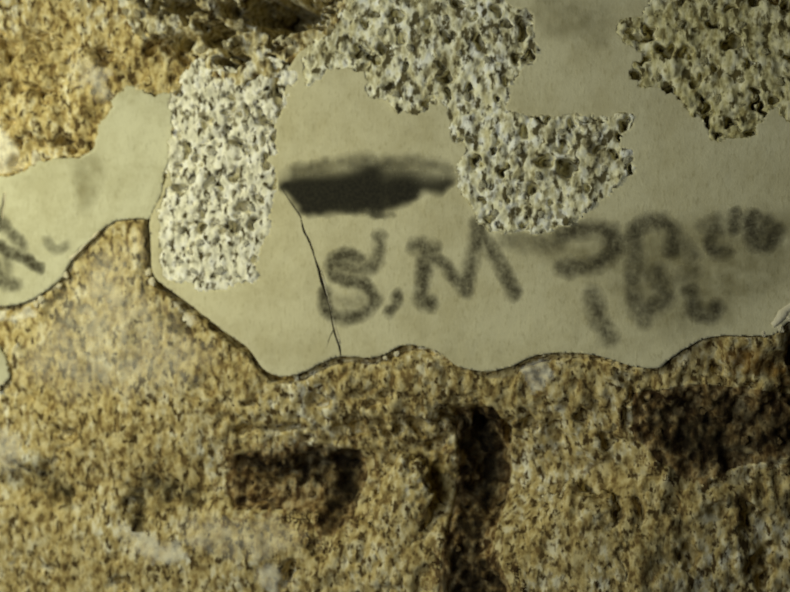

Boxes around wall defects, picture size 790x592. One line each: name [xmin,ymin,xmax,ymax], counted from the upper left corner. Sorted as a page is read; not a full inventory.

flaking render [0,0,790,377]
crack [282,190,341,356]
flaking render [0,346,12,390]
spalling [212,430,381,556]
spalling [425,398,528,592]
spalling [613,377,790,490]